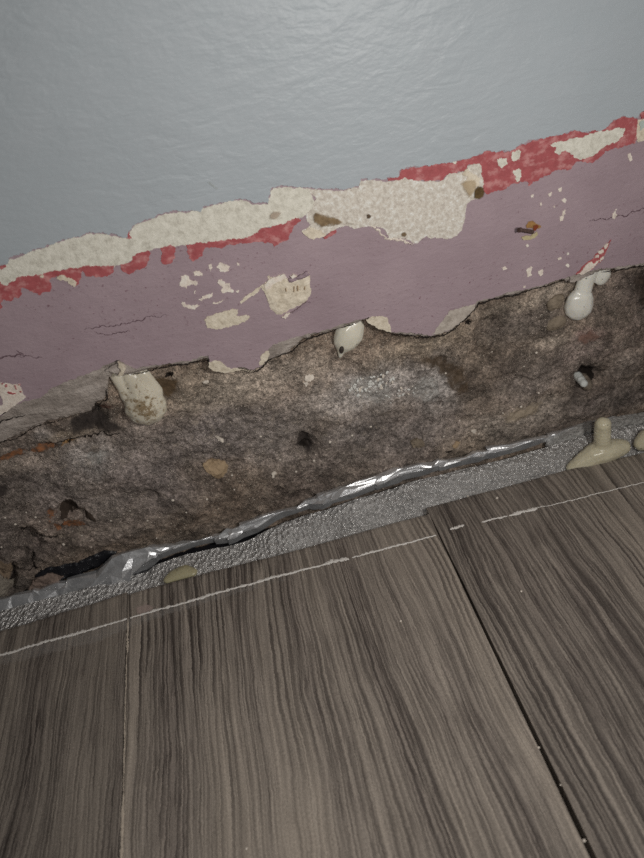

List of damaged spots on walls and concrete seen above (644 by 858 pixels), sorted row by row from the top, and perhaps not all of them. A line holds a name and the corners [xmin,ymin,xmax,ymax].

peeling [0,111,644,330]
crack [0,412,120,445]
spalling [0,240,644,598]
crack [10,527,61,579]